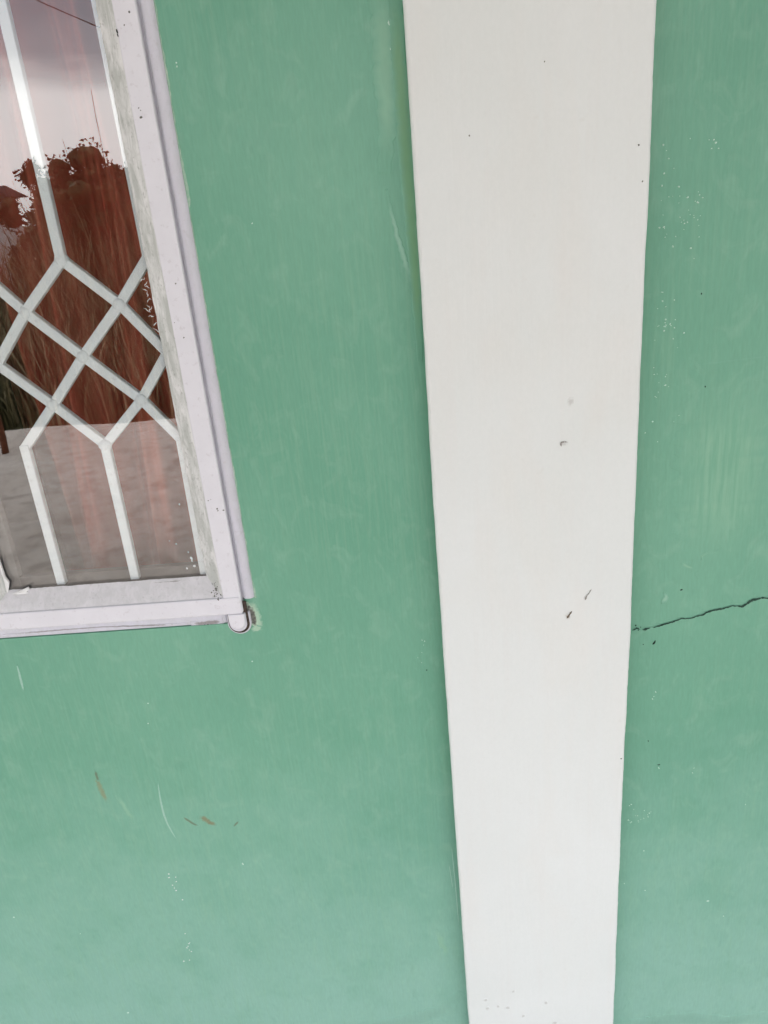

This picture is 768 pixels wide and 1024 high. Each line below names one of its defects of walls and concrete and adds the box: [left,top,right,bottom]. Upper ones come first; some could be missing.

crack [632,595,768,632]